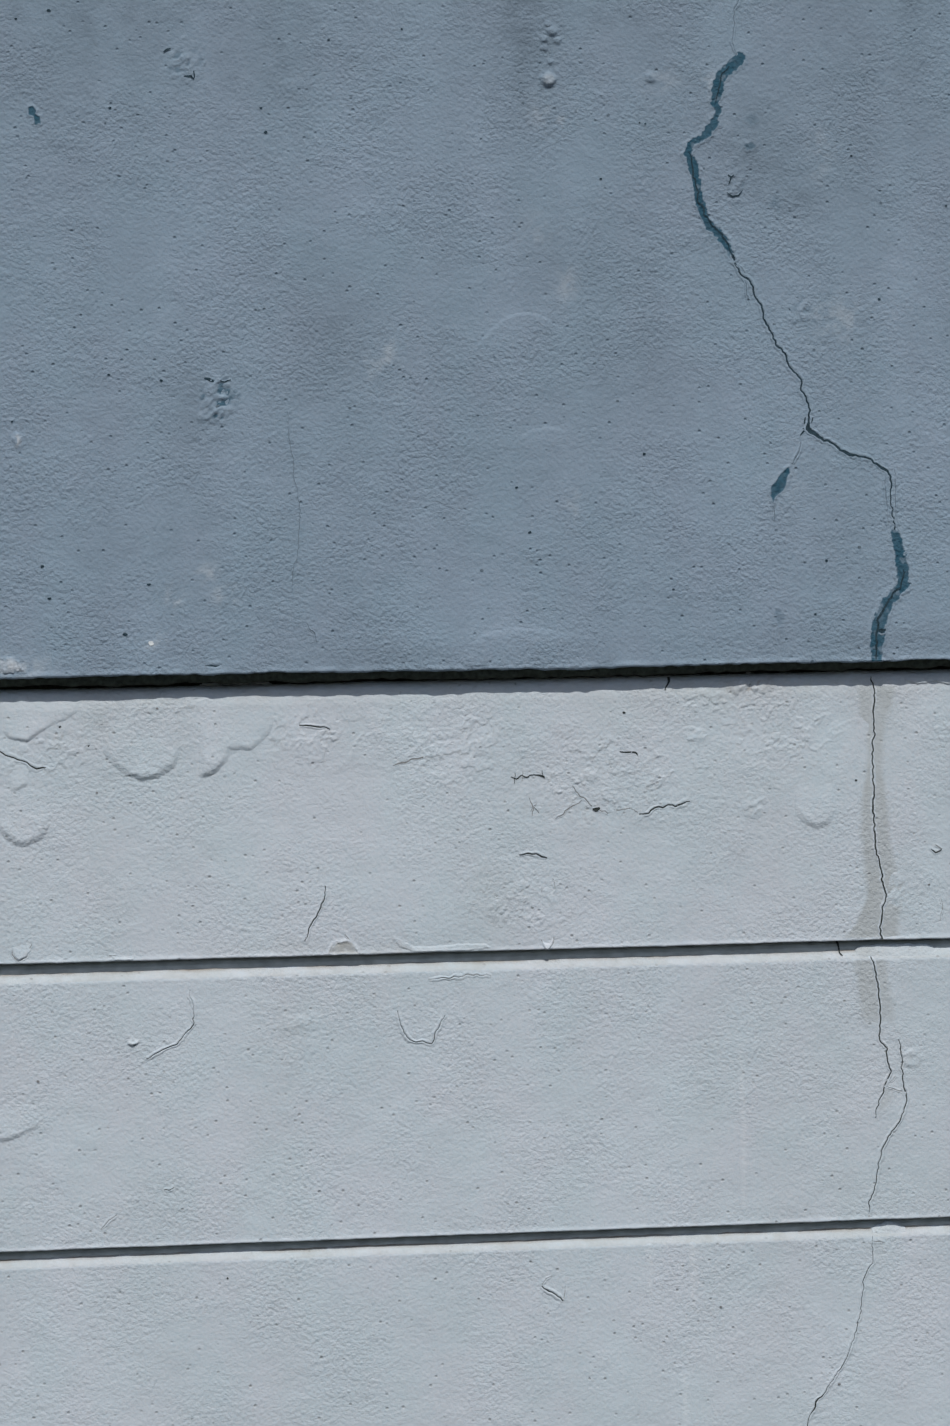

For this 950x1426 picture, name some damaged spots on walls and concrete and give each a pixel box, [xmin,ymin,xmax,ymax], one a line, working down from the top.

peeling [0,651,950,846]
crack [679,0,913,1426]